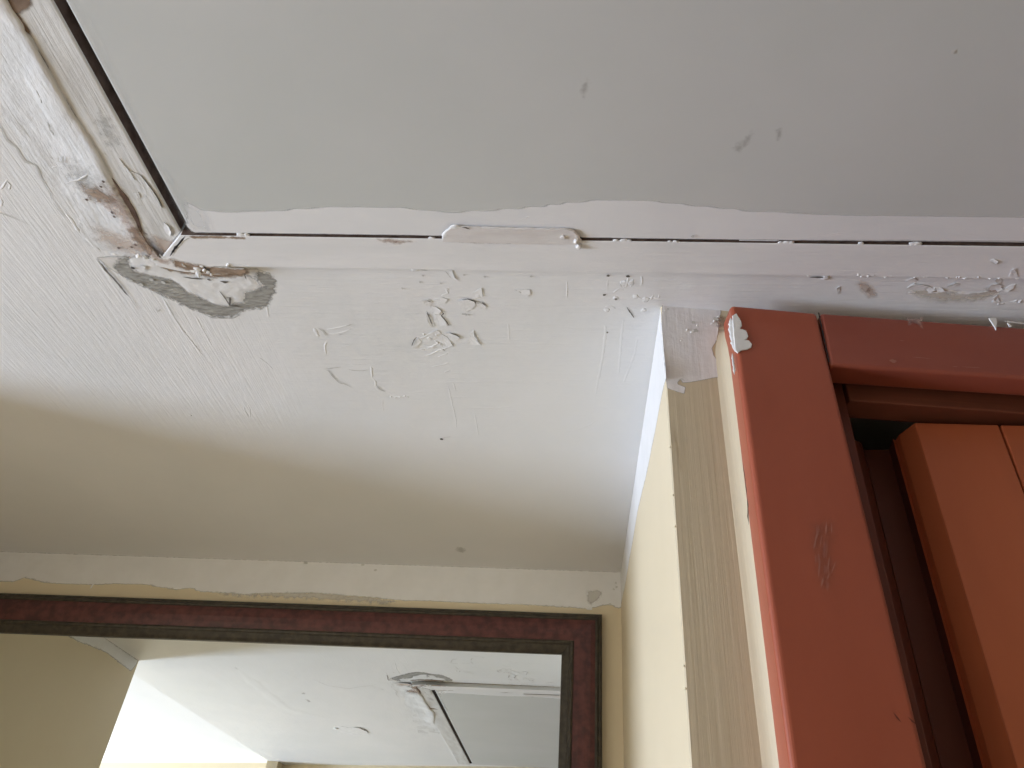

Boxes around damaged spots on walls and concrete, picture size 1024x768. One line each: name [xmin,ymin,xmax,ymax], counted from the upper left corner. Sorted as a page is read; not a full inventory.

peeling [0,0,276,318]
peeling [412,270,487,373]
peeling [906,259,1024,305]